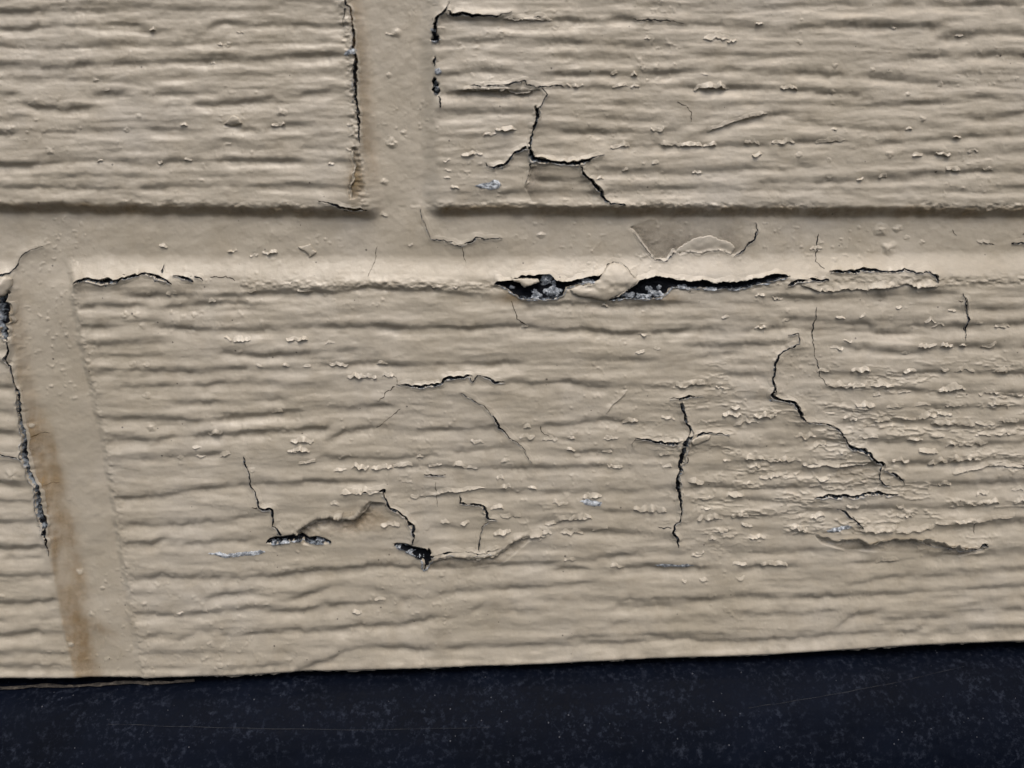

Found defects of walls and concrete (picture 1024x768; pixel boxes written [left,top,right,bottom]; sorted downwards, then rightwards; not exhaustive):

crack [430,0,548,27]
crack [470,76,627,209]
crack [72,264,235,288]
spalling [493,226,790,307]
crack [0,245,60,556]
crack [635,391,730,548]
peeling [722,405,777,426]
peeling [726,431,872,498]
crack [766,233,973,529]
peeling [817,366,1024,486]
peeling [741,522,766,540]
peeling [789,485,1024,563]